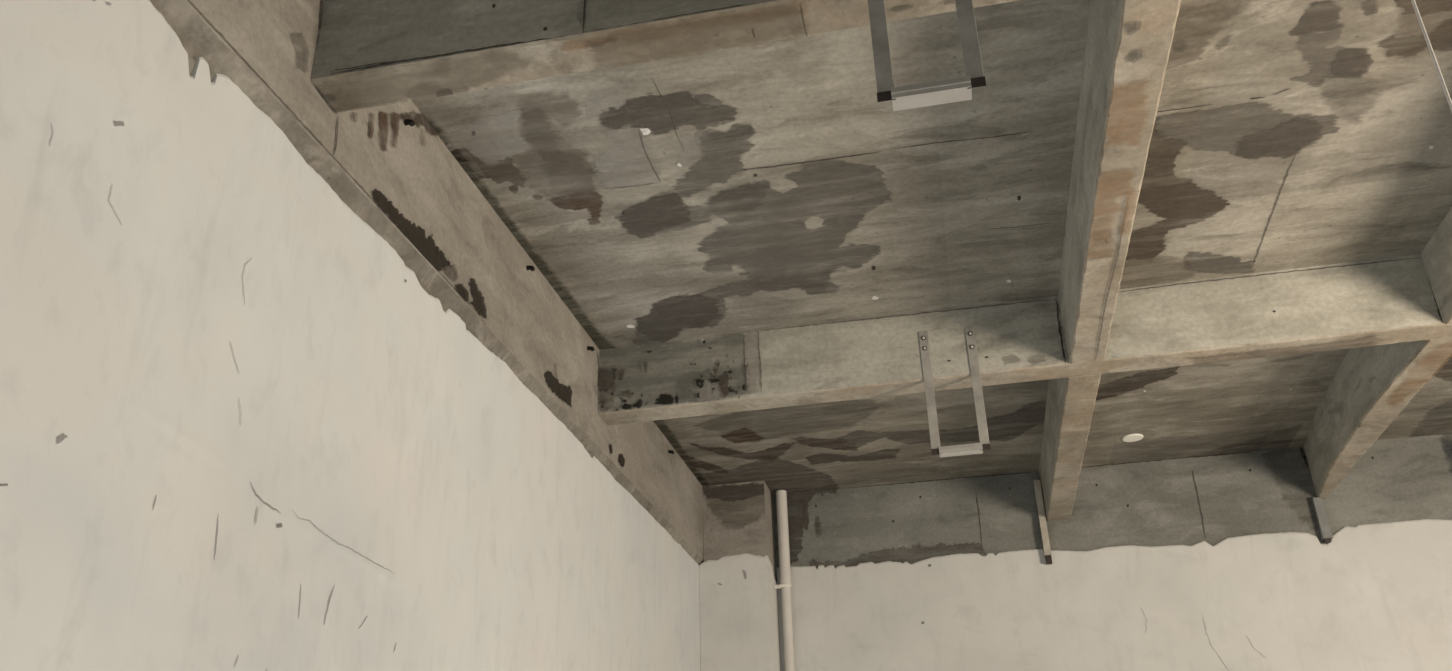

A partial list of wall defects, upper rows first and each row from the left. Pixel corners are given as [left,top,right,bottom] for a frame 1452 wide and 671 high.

water stain [331,72,614,350]
water stain [600,92,891,398]
water stain [544,371,572,407]
water stain [597,369,1046,568]